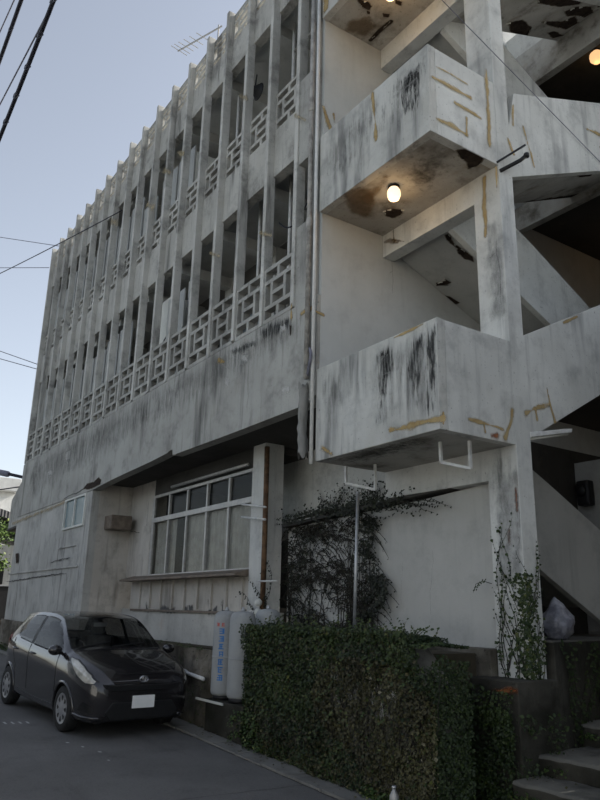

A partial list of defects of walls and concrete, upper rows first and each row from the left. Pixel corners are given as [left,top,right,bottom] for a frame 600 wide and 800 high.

spalling [368,13,393,42]
spalling [506,20,532,36]
spalling [538,0,600,38]
water stain [401,65,422,111]
spalling [455,149,484,169]
water stain [346,188,380,217]
spalling [383,208,404,218]
spalling [445,234,474,262]
water stain [262,304,324,339]
water stain [377,348,394,405]
water stain [389,324,446,432]
water stain [468,408,513,440]